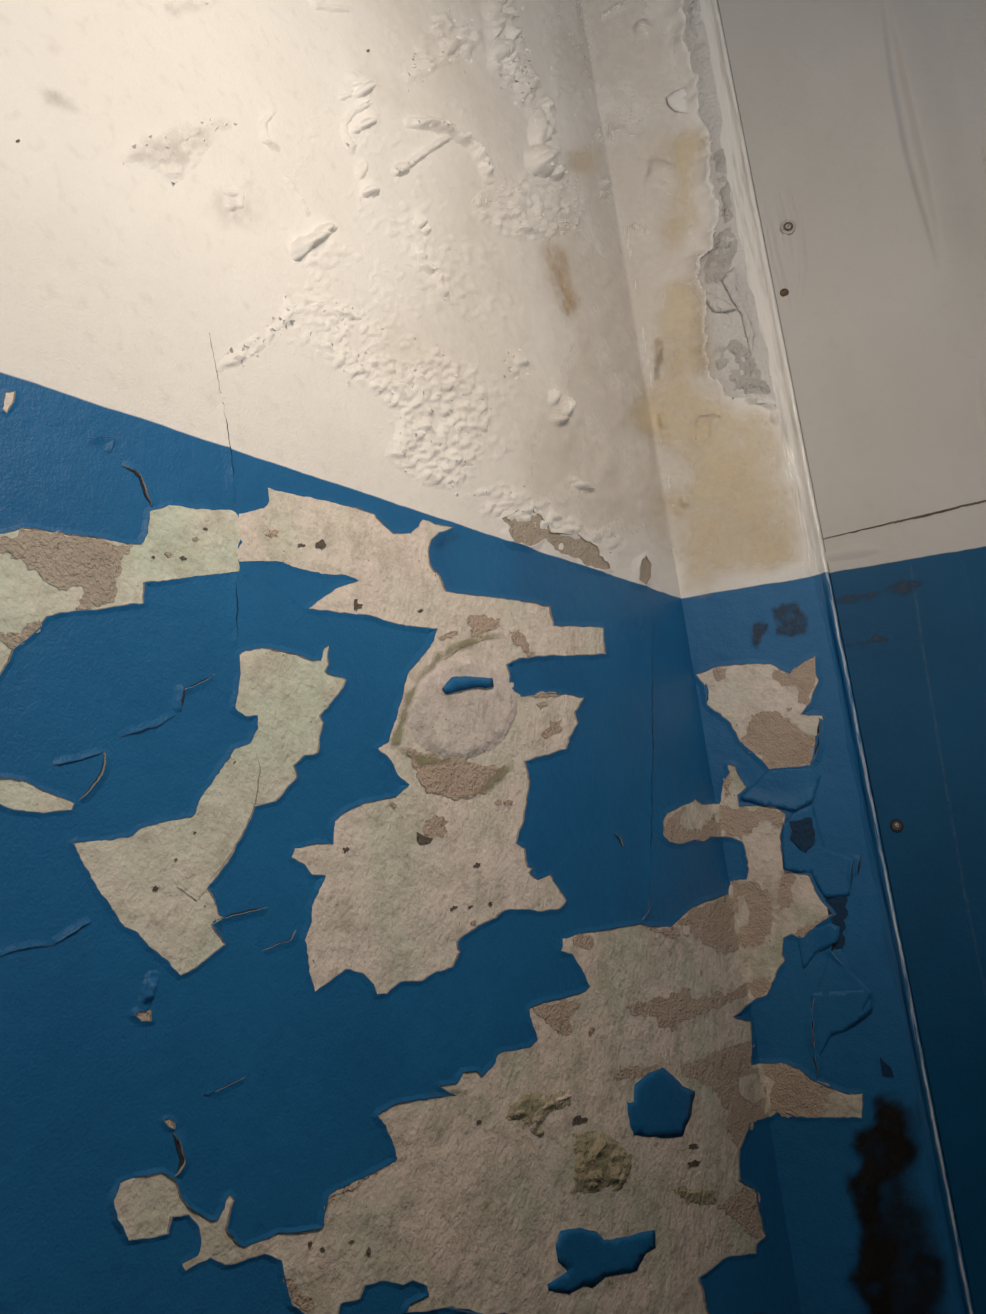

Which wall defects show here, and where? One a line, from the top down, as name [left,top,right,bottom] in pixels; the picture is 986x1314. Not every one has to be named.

leakage [544,119,790,566]
peeling [0,484,611,1027]
peeling [105,652,873,1314]
leakage [849,1098,942,1314]